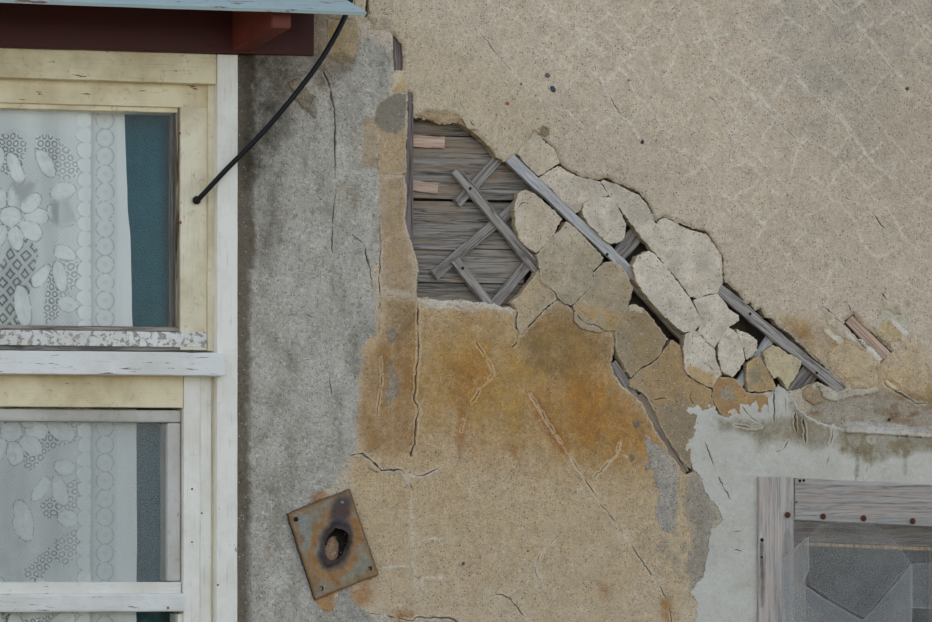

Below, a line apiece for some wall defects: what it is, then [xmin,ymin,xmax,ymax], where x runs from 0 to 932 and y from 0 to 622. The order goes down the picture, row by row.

crack [456,98,477,129]
crack [790,72,895,181]
crack [320,69,386,419]
crack [351,299,522,622]
water stain [423,309,661,458]
crack [527,391,676,622]
peeling [802,373,899,406]
spalling [818,298,912,362]